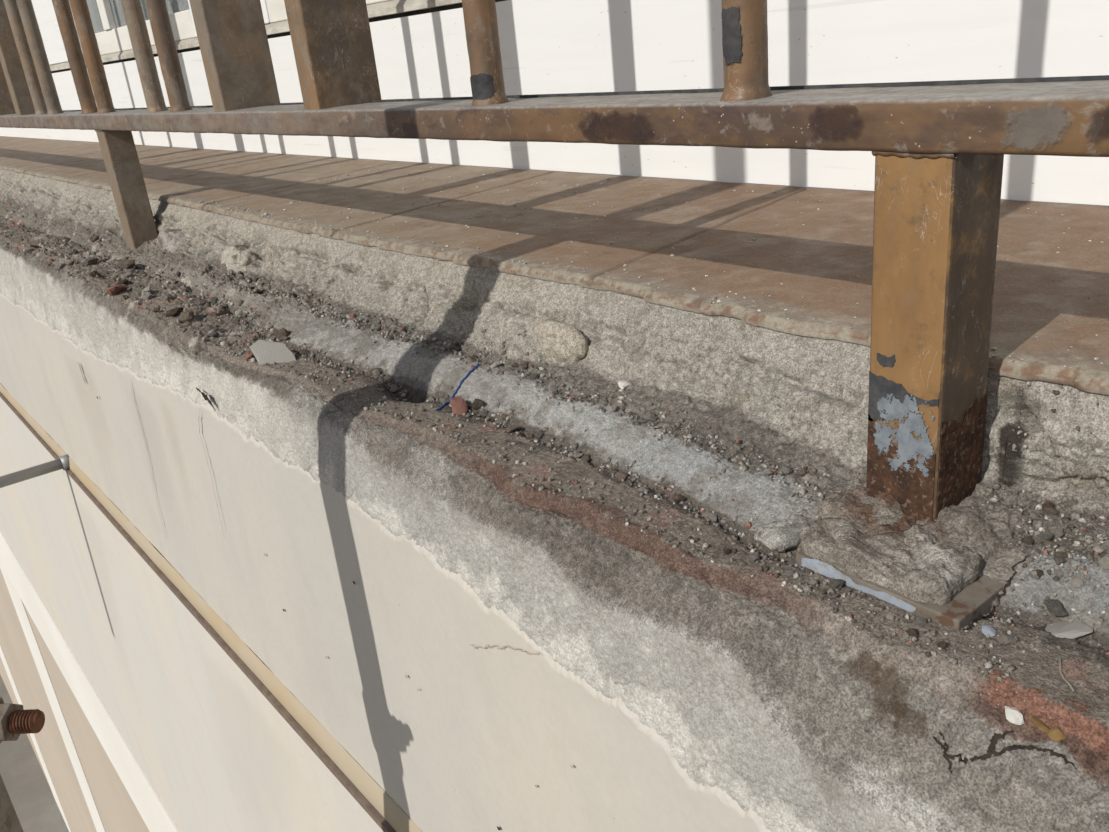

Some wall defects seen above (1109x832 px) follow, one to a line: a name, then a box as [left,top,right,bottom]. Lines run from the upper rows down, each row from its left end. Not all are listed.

peeling [811,106,860,137]
peeling [1003,105,1070,150]
peeling [1088,108,1109,137]
spalling [0,169,939,499]
rust [866,391,988,521]
spalling [0,236,1109,832]
crack [932,731,1076,774]